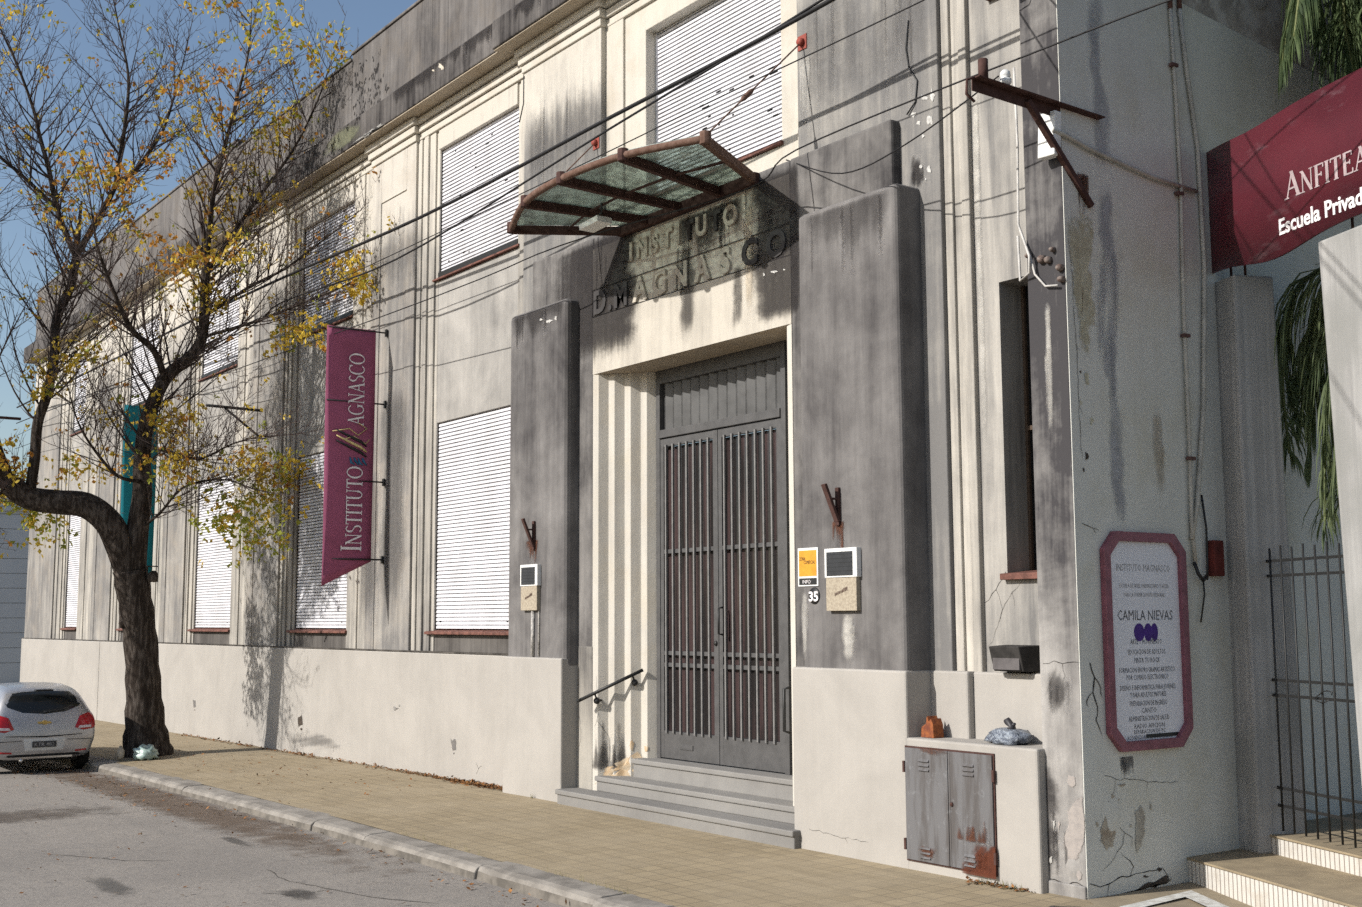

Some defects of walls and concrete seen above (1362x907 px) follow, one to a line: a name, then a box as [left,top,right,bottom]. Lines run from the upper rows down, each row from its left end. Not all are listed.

leakage [514,0,533,16]
leakage [395,24,492,101]
leakage [331,128,357,149]
rust [1077,173,1089,203]
leakage [1101,199,1115,268]
leakage [1111,423,1125,511]
leakage [594,746,625,769]
rust [958,828,996,879]
crack [1050,829,1170,907]